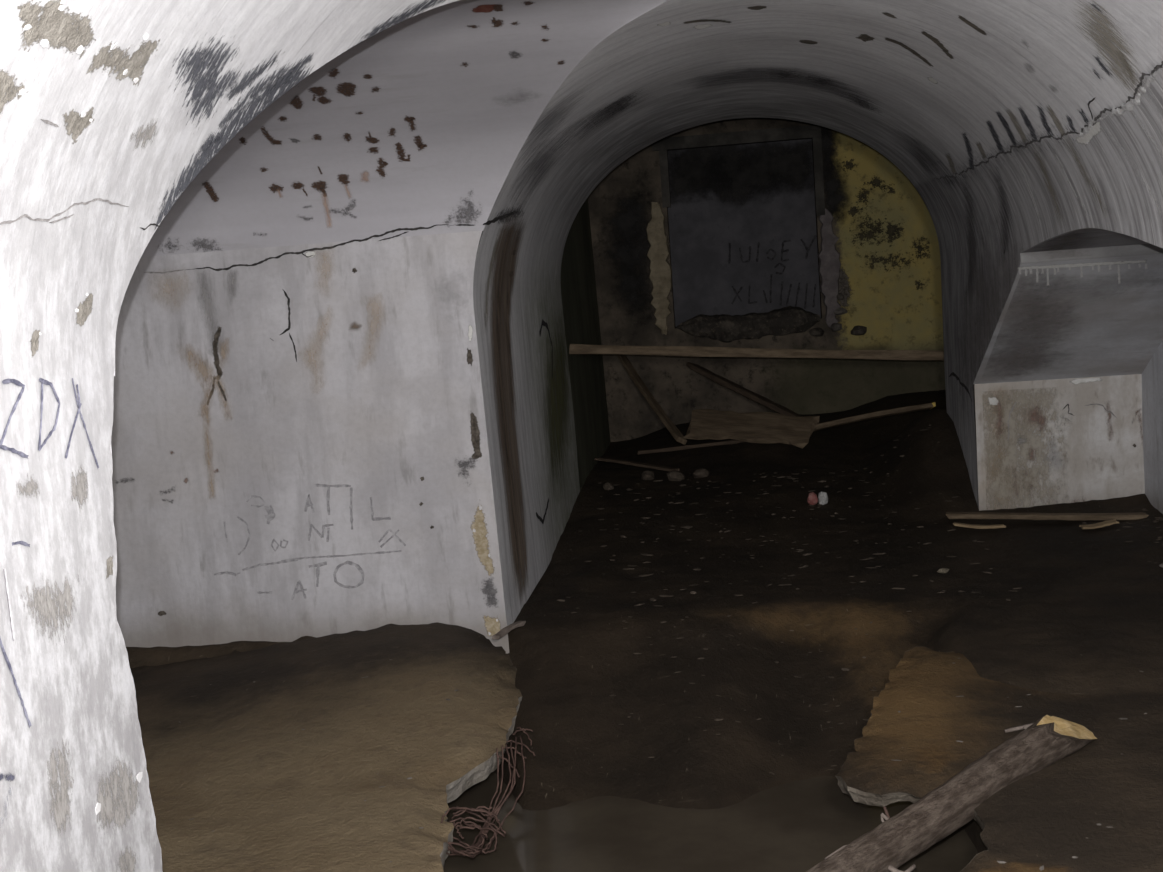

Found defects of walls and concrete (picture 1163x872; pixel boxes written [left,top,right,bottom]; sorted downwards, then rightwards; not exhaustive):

peeling [18,0,160,86]
peeling [0,69,25,113]
peeling [63,107,94,144]
water stain [155,36,314,229]
corrosion [279,68,379,122]
corrosion [363,116,427,181]
crack [934,61,1163,179]
corrosion [202,182,219,202]
corrosion [269,167,350,225]
crack [144,211,517,274]
water stain [847,176,930,272]
spalling [440,657,522,869]